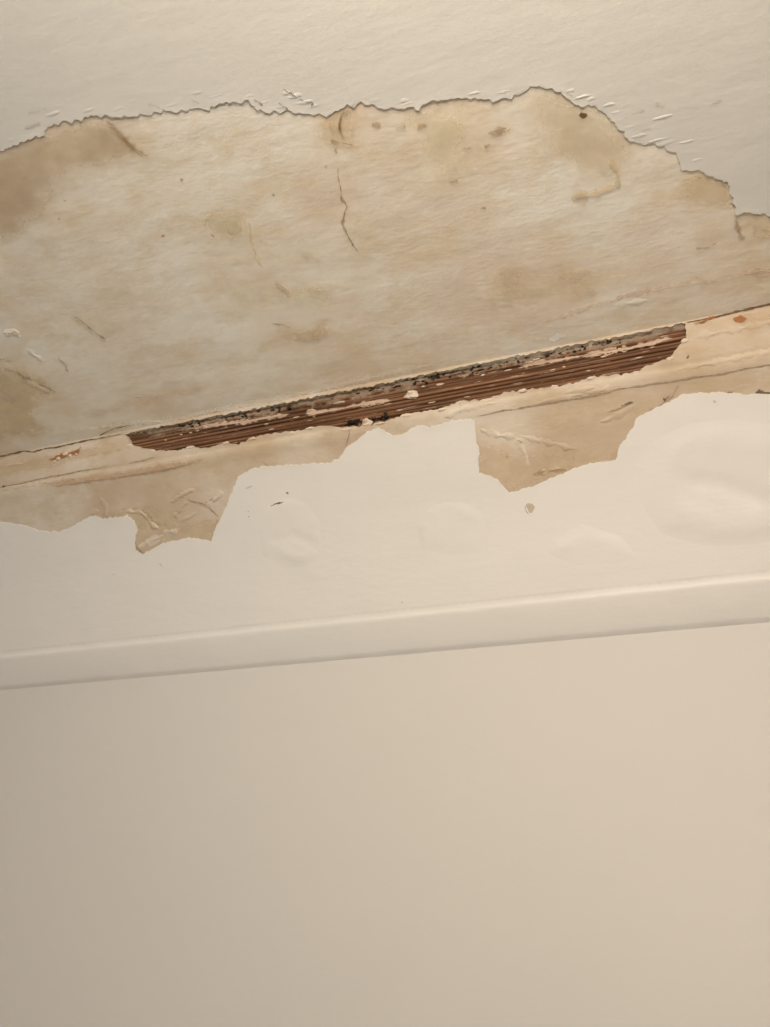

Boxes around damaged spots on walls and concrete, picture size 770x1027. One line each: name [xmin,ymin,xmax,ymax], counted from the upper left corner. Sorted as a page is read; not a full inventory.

damp [0,123,134,233]
peeling [0,86,770,550]
mould [343,412,389,427]
damp [355,357,527,394]